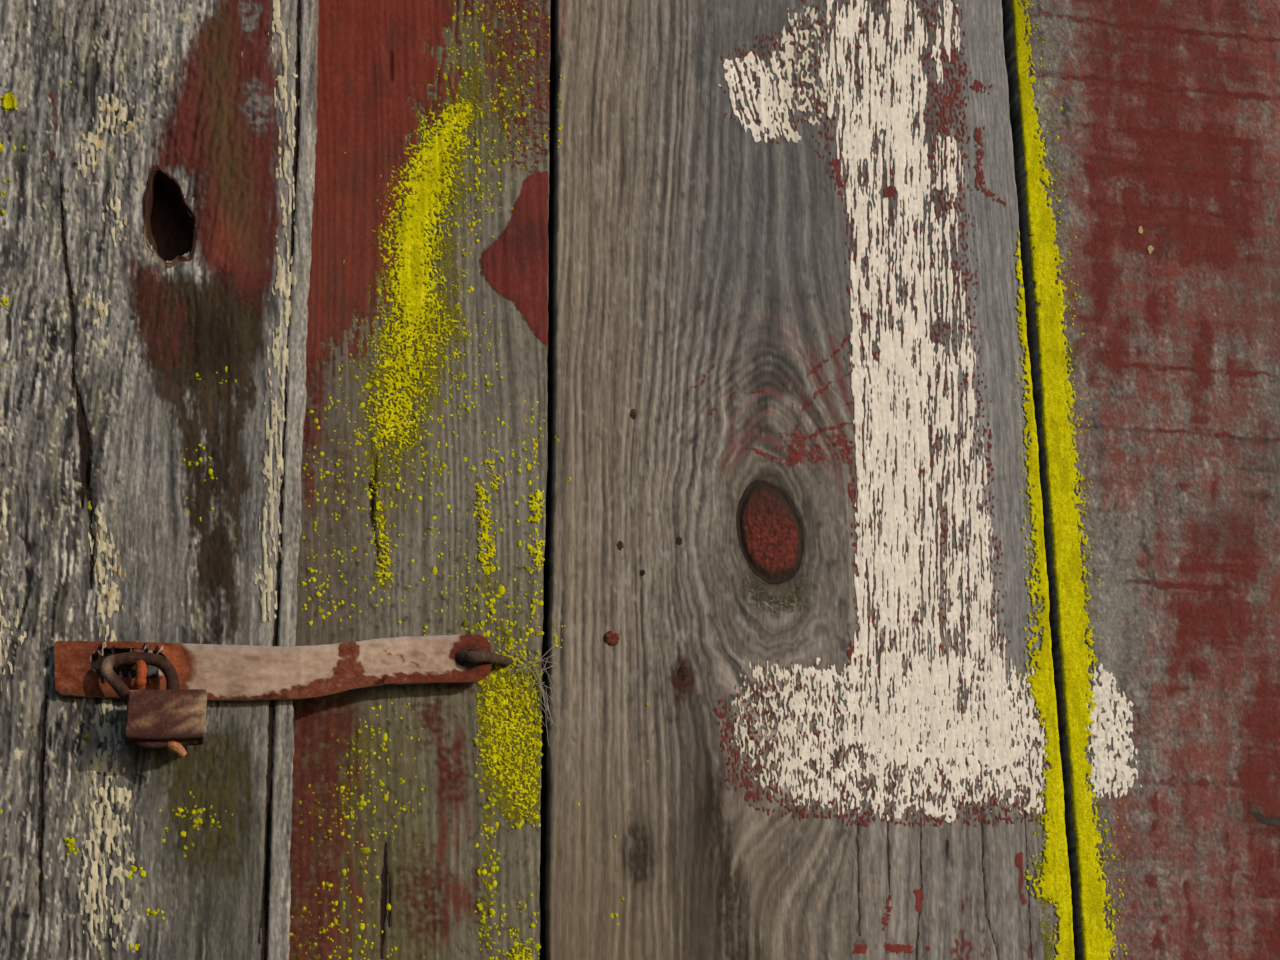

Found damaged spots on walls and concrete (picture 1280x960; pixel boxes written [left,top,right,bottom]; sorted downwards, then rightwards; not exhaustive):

peeling [1038,74,1266,101]
crack [59,173,94,589]
peeling [82,284,111,329]
peeling [130,262,195,389]
peeling [713,0,1048,827]
peeling [1076,293,1241,439]
corrosion [54,641,193,697]
corrosion [207,634,491,700]
peeling [1134,521,1280,960]